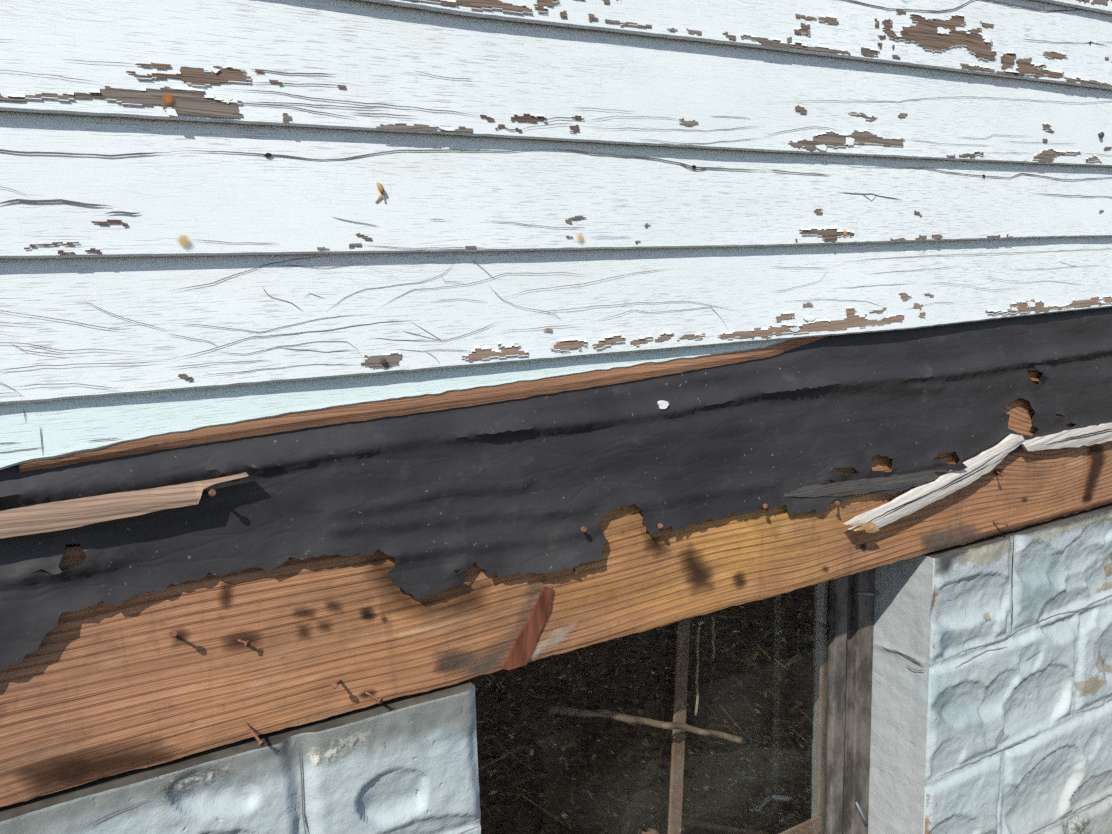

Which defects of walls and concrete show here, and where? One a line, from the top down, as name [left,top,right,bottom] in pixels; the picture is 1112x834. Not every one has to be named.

peeling [411,0,567,18]
peeling [588,14,652,28]
peeling [723,8,1112,86]
peeling [0,62,283,118]
peeling [795,209,854,242]
peeling [985,295,1112,315]
crack [0,217,739,454]
peeling [360,351,402,370]
peeling [462,342,529,362]
peeling [543,293,934,352]
leakage [24,749,164,791]
leakage [175,771,213,789]